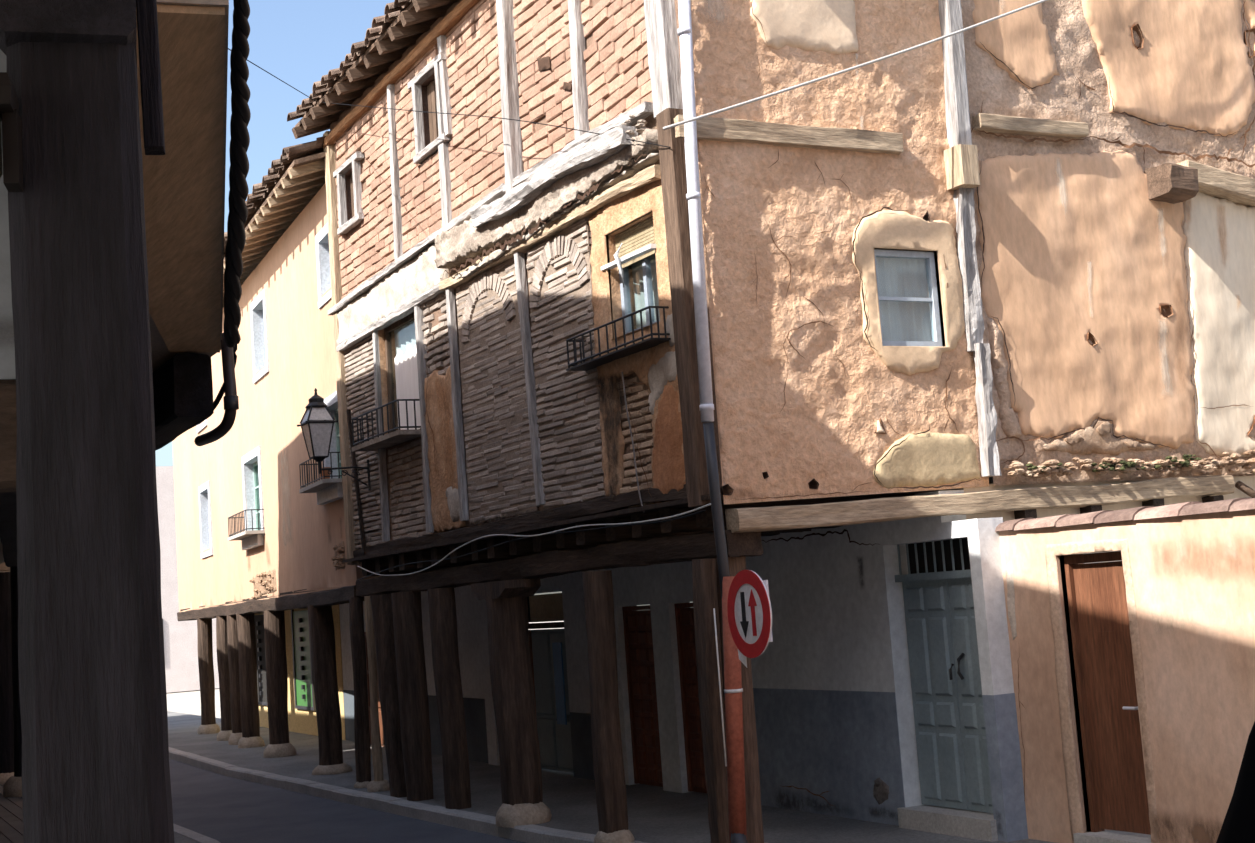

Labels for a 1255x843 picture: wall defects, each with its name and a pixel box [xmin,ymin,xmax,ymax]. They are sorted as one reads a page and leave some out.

spalling [1131,24,1144,49]
crack [1243,2,1255,78]
crack [971,42,1255,283]
crack [751,163,909,414]
spalling [1160,305,1173,317]
crack [734,288,1255,500]
peeling [618,377,686,509]
peeling [1042,419,1160,456]
crack [762,529,880,546]